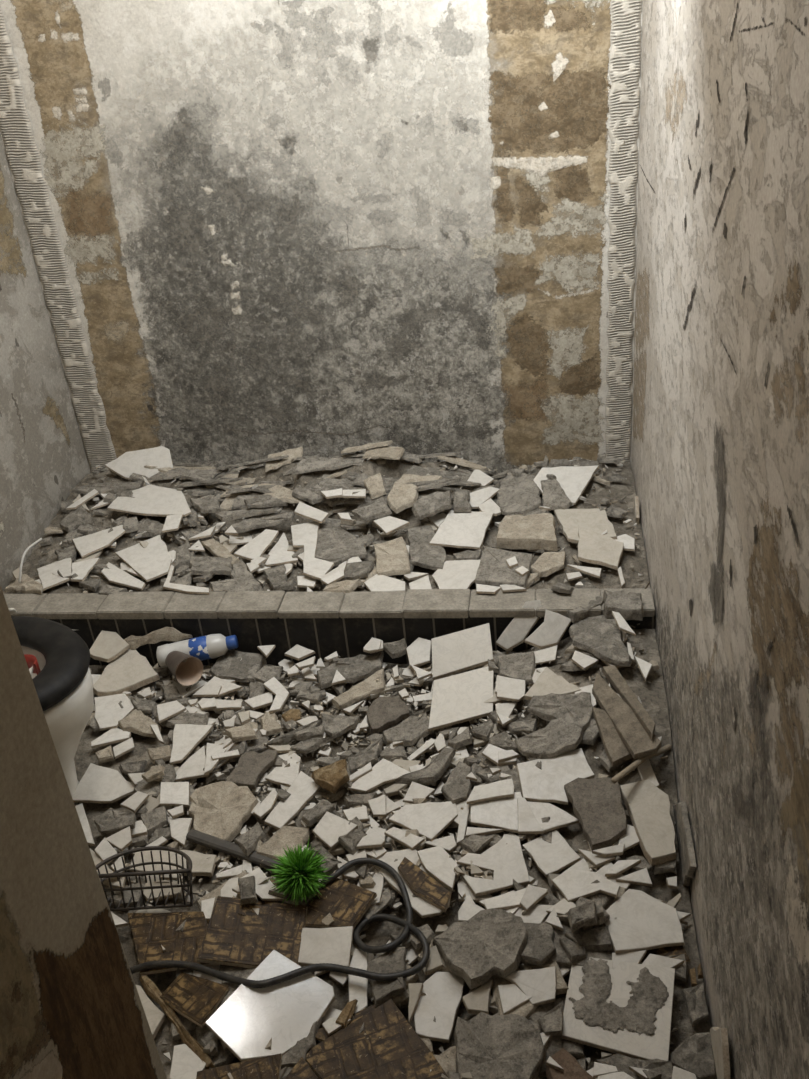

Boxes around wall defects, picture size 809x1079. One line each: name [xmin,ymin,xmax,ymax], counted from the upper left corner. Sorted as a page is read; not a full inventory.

flaking render [543,0,556,28]
peeling [98,77,111,101]
flaking render [551,52,569,82]
flaking render [40,120,123,200]
flaking render [64,233,119,285]
damp [121,98,519,473]
flaking render [546,326,588,379]
peeling [42,396,70,445]
flaking render [535,393,606,446]
flaking render [746,499,809,970]
flaking render [21,1051,63,1079]